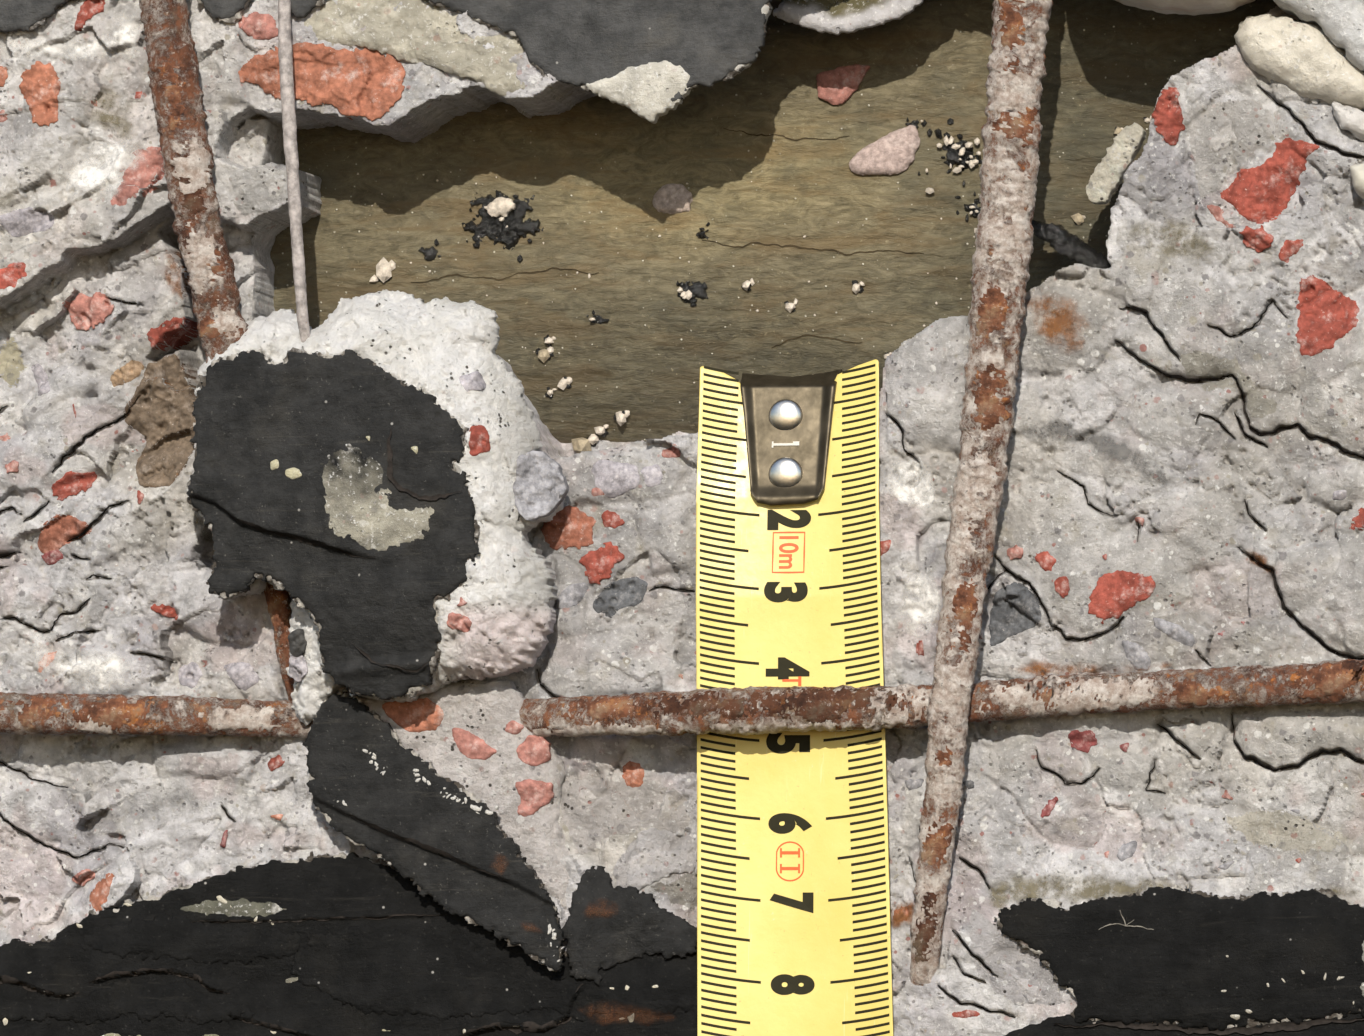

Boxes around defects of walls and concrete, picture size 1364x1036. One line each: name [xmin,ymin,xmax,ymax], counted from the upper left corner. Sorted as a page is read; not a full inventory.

peeling [0,0,77,34]
peeling [197,0,252,24]
peeling [291,0,923,124]
peeling [1086,123,1146,205]
rust [971,363,1012,431]
crack [1116,307,1364,459]
crack [1,500,128,641]
rust [949,574,981,653]
crack [1238,499,1364,660]
rust [557,687,909,725]
crack [1231,714,1364,771]
rust [891,892,939,964]